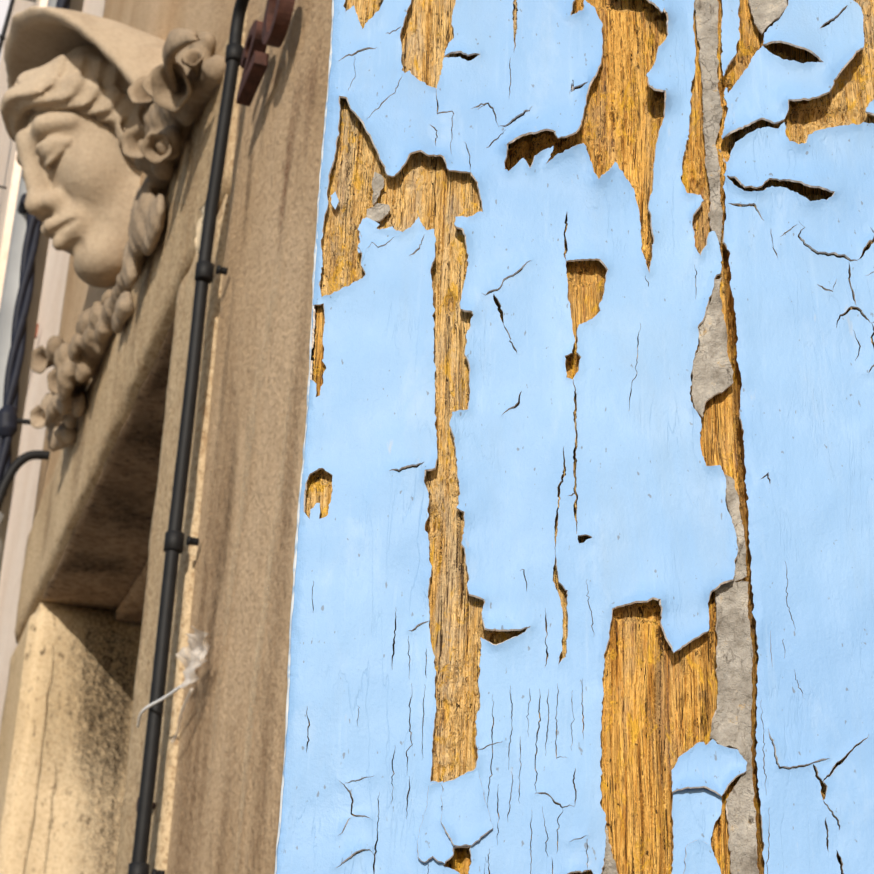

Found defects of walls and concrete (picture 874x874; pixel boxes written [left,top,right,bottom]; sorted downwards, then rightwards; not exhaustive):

crack [562,216,570,259]
crack [727,195,767,219]
crack [798,230,874,328]
peeling [305,469,333,518]
crack [554,392,578,547]
peeling [312,0,874,874]
crack [542,615,550,664]
crack [333,612,427,873]
crack [484,691,584,874]
crack [763,729,865,874]